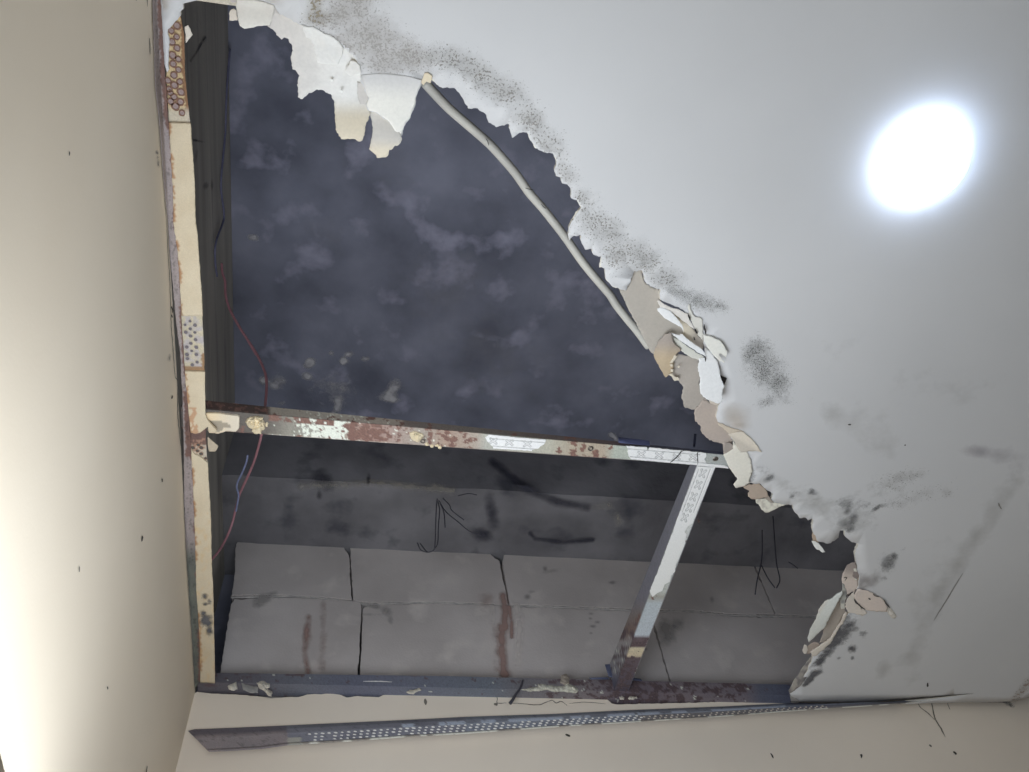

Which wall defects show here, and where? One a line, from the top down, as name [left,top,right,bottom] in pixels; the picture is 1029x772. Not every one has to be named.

leakage [428,48,728,313]
leakage [382,383,399,402]
leakage [740,340,797,406]
corrosion [498,593,520,678]
leakage [803,617,868,687]